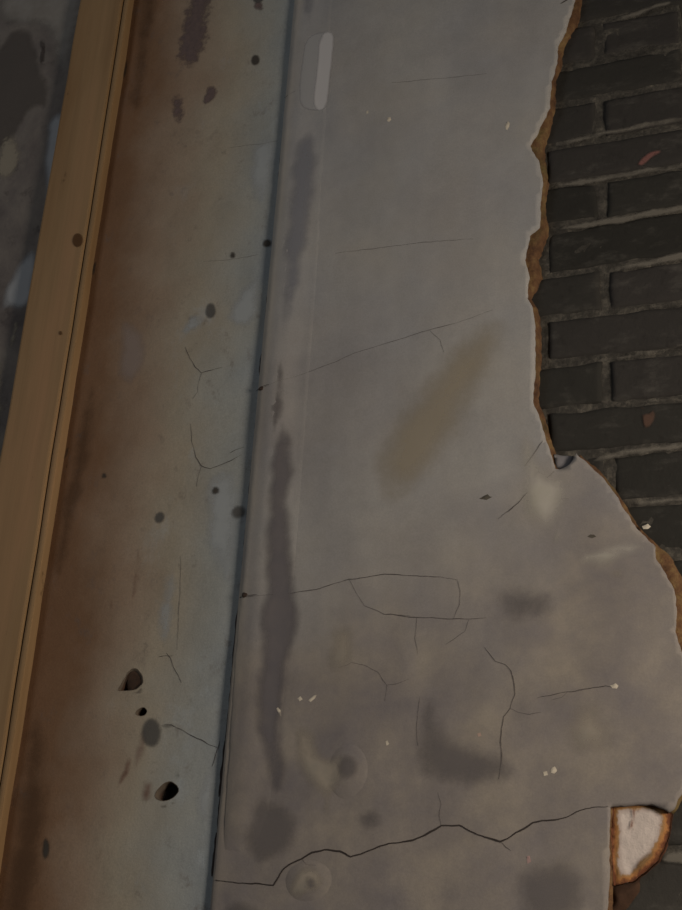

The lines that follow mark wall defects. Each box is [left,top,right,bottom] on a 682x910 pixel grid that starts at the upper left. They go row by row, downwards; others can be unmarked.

peeling [554,454,574,469]
water stain [260,438,295,785]
crack [294,574,479,643]
crack [165,594,614,886]
spalling [611,805,673,910]